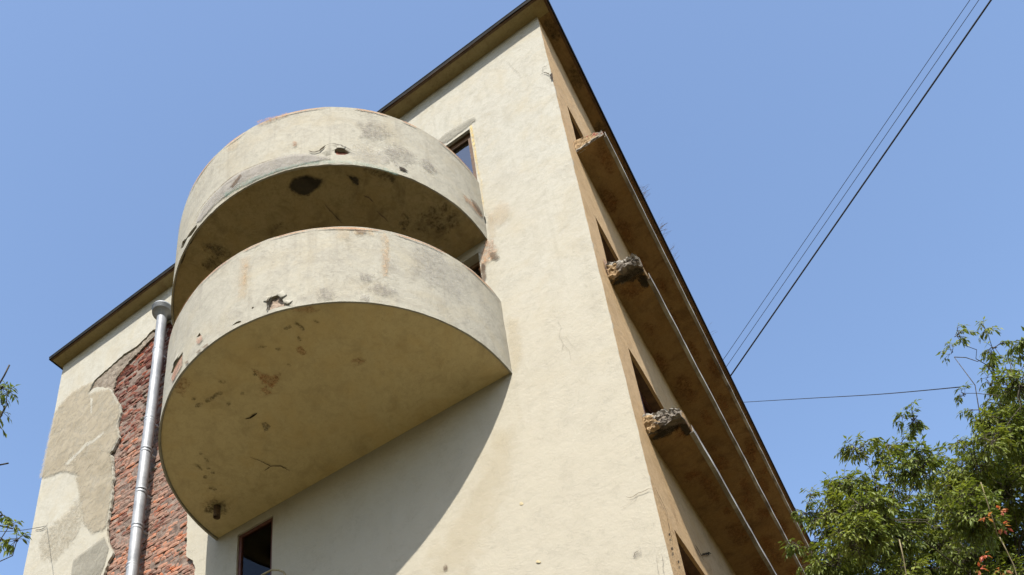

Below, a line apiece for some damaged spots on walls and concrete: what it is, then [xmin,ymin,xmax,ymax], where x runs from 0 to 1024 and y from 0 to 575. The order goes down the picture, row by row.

peeling [181,145,347,264]
spalling [604,253,649,288]
flaking render [91,322,208,575]
spalling [642,407,691,440]